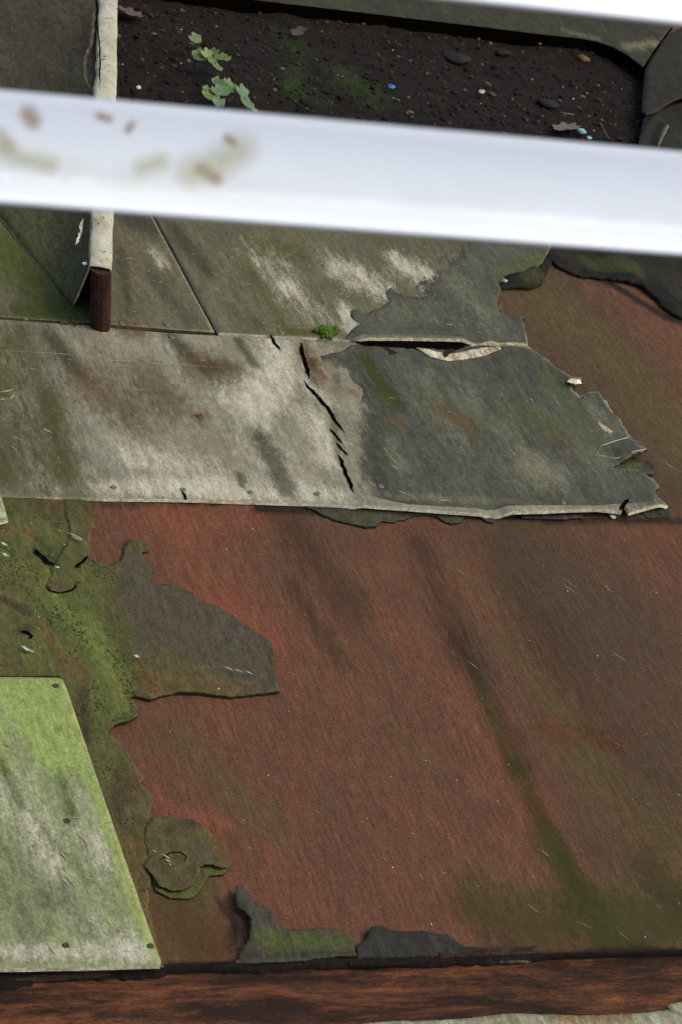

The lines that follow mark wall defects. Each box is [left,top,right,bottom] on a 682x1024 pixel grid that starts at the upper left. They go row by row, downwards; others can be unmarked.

leakage [254,432,298,499]
crack [270,334,354,492]
peeling [299,240,682,529]
peeling [0,497,280,974]
peeling [234,886,540,965]